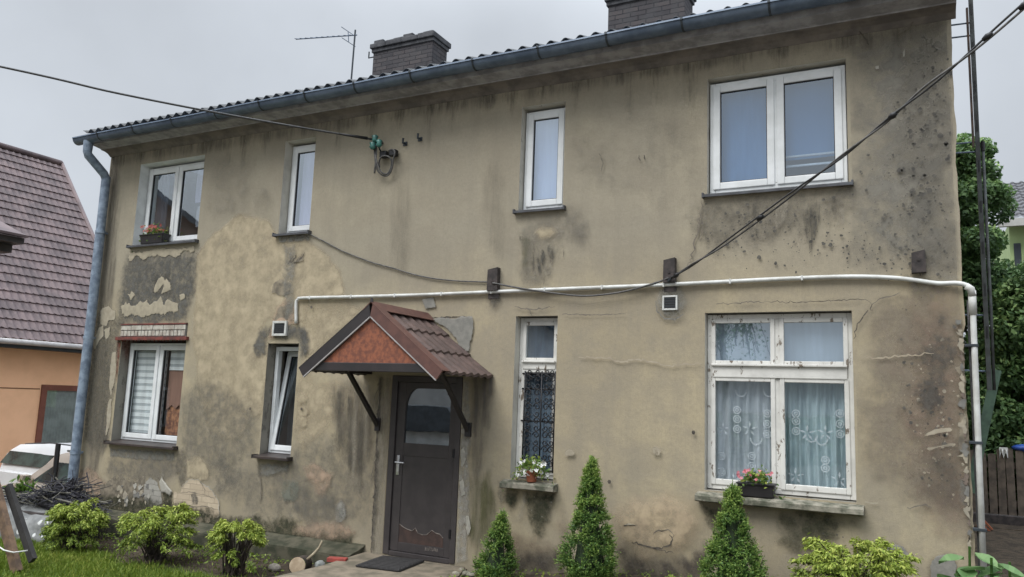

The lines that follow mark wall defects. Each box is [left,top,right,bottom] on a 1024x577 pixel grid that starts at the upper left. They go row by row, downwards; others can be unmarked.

damp [690,45,954,288]
peeling [120,245,195,324]
crack [717,293,934,359]
spalling [898,320,972,546]
flaking render [99,476,220,523]
crack [624,523,674,553]